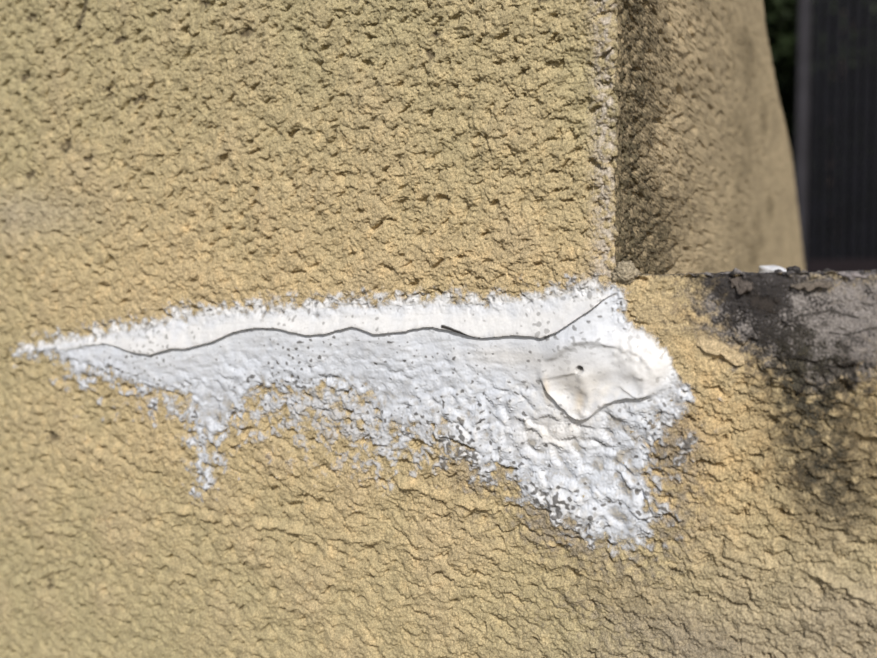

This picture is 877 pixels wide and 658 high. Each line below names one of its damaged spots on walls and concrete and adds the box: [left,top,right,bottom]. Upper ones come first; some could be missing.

leakage [687,268,877,524]